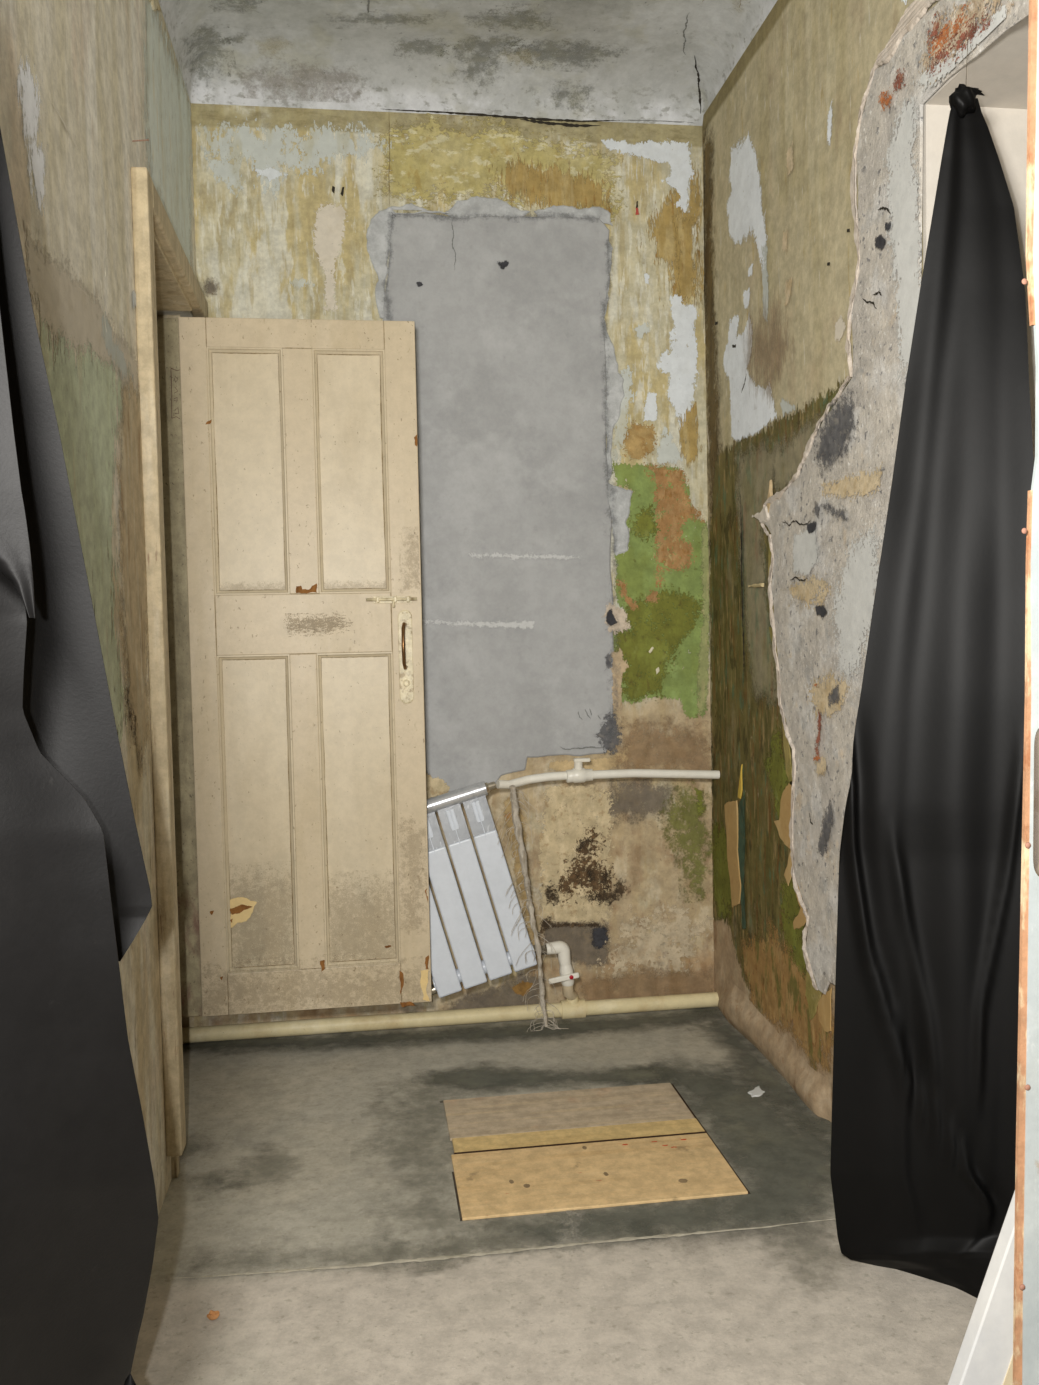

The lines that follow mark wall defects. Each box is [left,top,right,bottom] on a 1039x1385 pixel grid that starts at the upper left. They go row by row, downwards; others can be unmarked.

peeling [289,202,349,313]
crack [385,1,703,207]
peeling [601,138,694,213]
peeling [723,131,796,441]
peeling [296,584,317,594]
peeling [578,294,710,720]
flaking render [748,0,1029,1032]
damp [183,379,851,1254]